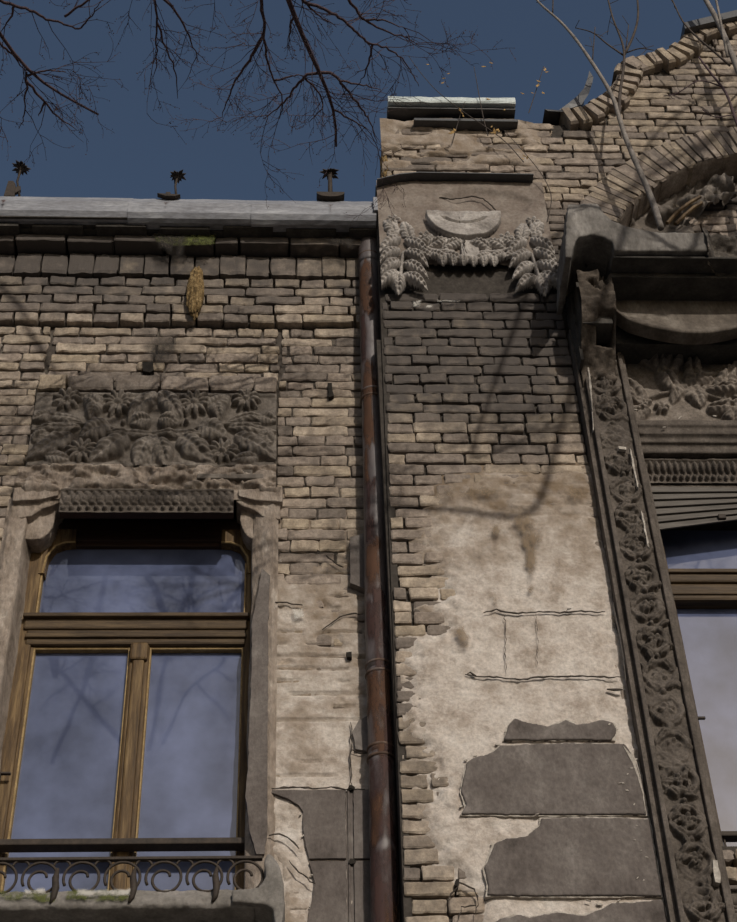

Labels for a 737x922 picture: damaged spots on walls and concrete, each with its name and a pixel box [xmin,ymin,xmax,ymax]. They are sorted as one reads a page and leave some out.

peeling [618,446,639,489]
water stain [515,516,540,573]
rust [359,258,398,922]
crack [465,608,623,691]
crack [272,722,367,790]
flaking render [271,511,371,922]
flaking render [398,462,669,922]
crack [269,833,315,884]